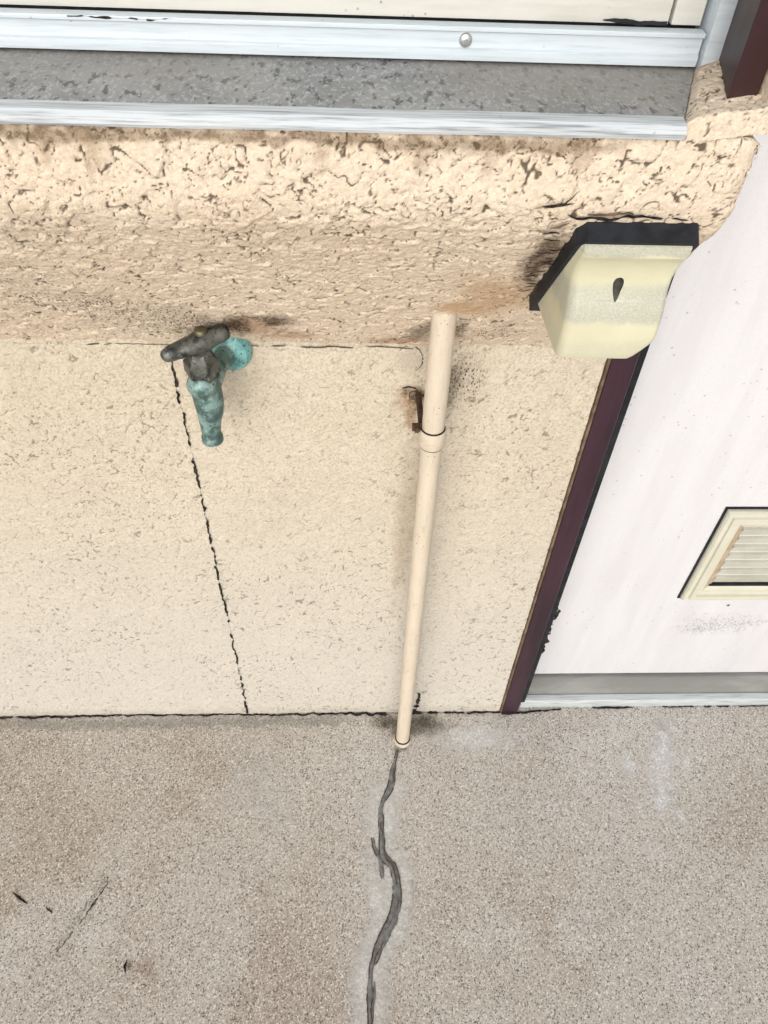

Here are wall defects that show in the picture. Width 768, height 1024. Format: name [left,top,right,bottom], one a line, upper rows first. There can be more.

crack [542,192,578,208]
crack [0,343,561,719]
crack [592,703,633,711]
crack [662,702,768,710]
crack [366,750,402,1024]